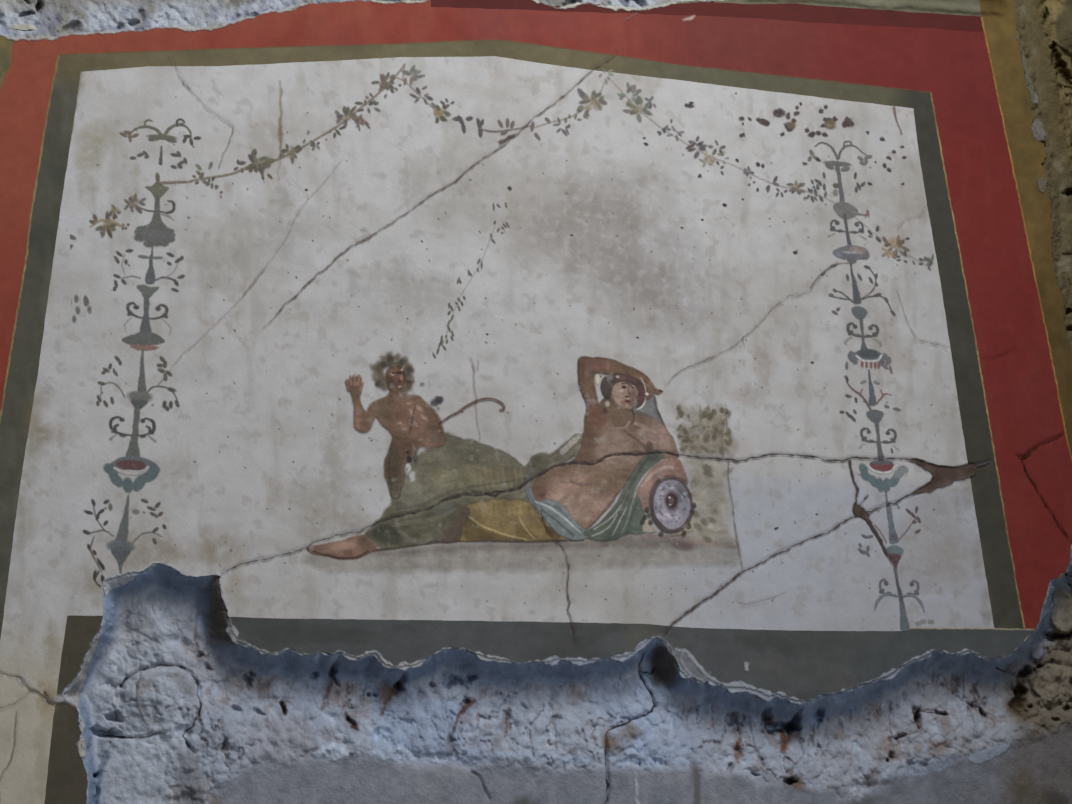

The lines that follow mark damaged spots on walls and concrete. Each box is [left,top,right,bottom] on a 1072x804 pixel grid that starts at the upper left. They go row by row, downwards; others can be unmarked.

flaking render [62,545,1072,804]